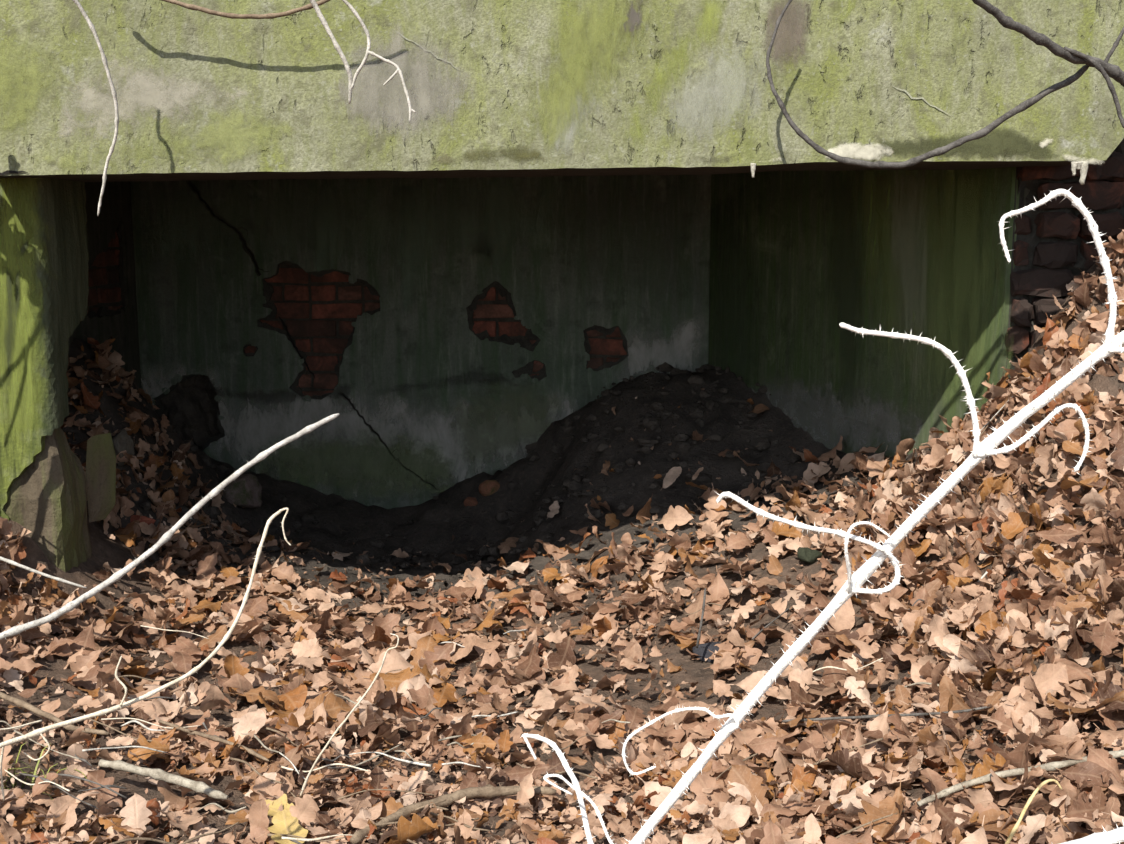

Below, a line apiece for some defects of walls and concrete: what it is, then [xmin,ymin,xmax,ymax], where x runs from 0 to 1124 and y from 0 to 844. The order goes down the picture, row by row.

crack [186,180,269,276]
water stain [0,178,42,437]
spalling [239,261,380,402]
spalling [466,281,547,384]
spalling [580,325,629,372]
water stain [627,322,700,376]
crack [338,392,441,492]
water stain [210,394,573,496]